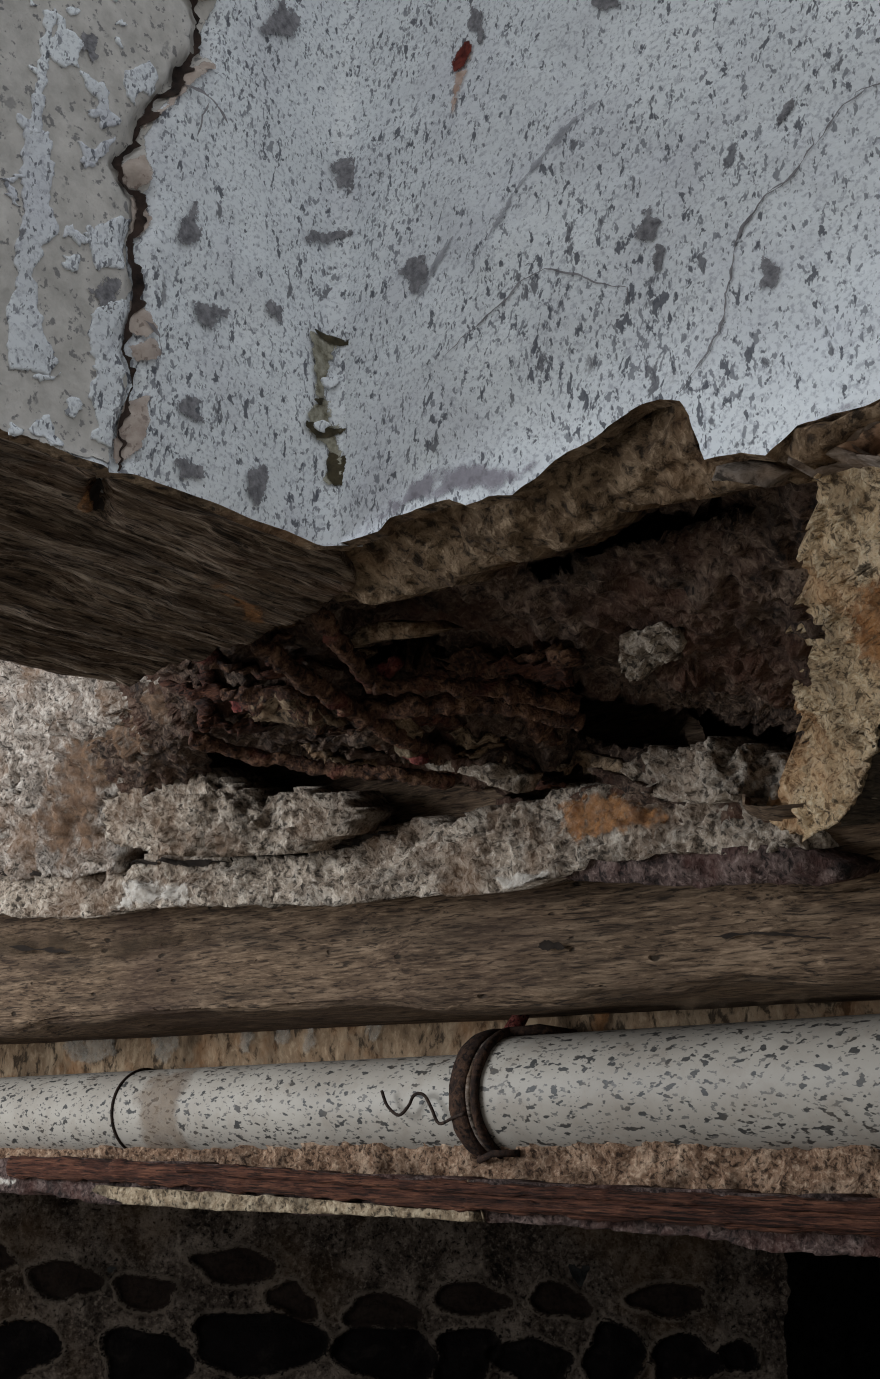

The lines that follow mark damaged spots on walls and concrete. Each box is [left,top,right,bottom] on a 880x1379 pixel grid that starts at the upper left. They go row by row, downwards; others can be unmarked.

rust [451,41,472,111]
peeling [0,0,217,463]
crack [89,0,229,511]
peeling [192,300,231,330]
peeling [265,299,284,323]
spalling [306,329,349,486]
spalling [0,402,880,919]